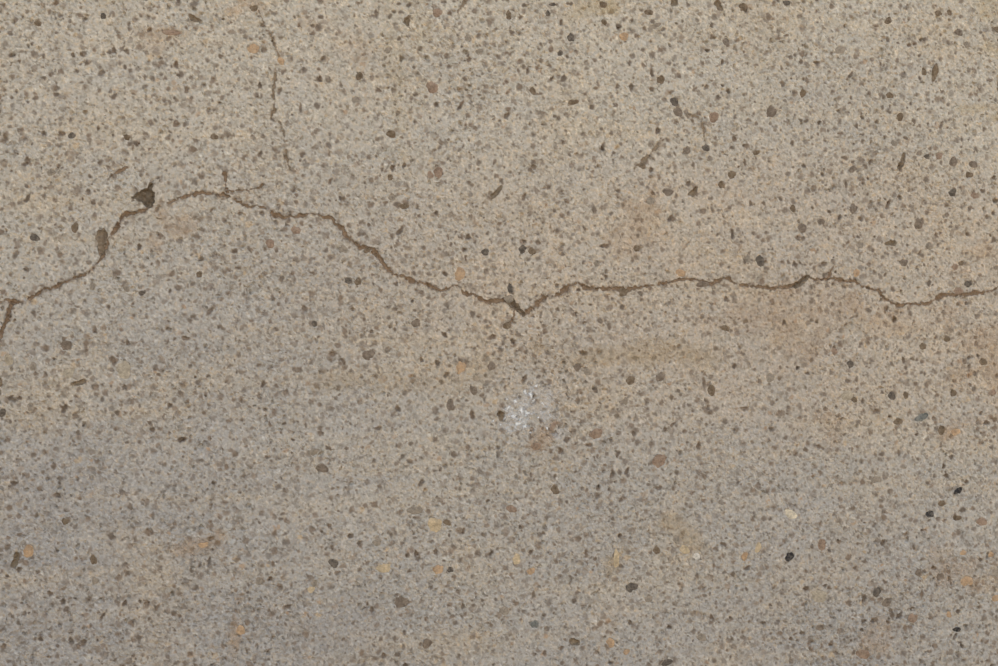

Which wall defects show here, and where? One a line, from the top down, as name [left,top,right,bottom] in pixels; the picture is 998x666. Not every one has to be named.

crack [110,166,128,177]
crack [0,172,997,339]